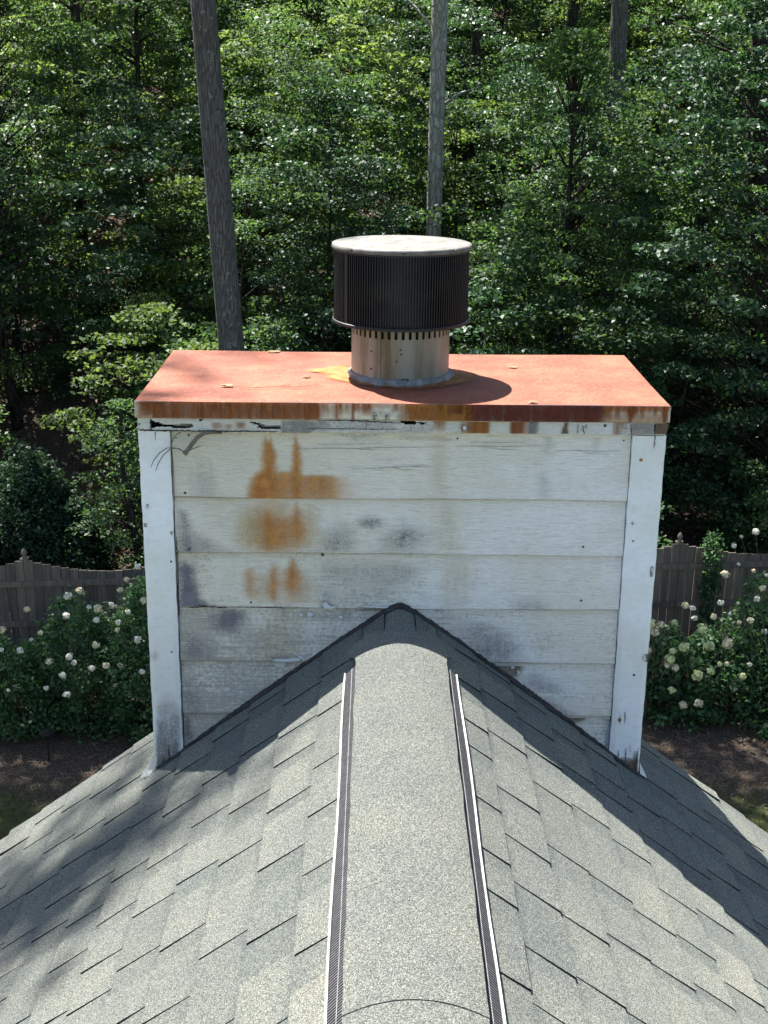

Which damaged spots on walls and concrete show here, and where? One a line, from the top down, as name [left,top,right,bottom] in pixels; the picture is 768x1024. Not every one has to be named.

rust [311,366,470,387]
crack [138,419,278,440]
rust [138,401,371,427]
rust [393,404,670,434]
rust [248,440,330,551]
rust [269,561,299,597]